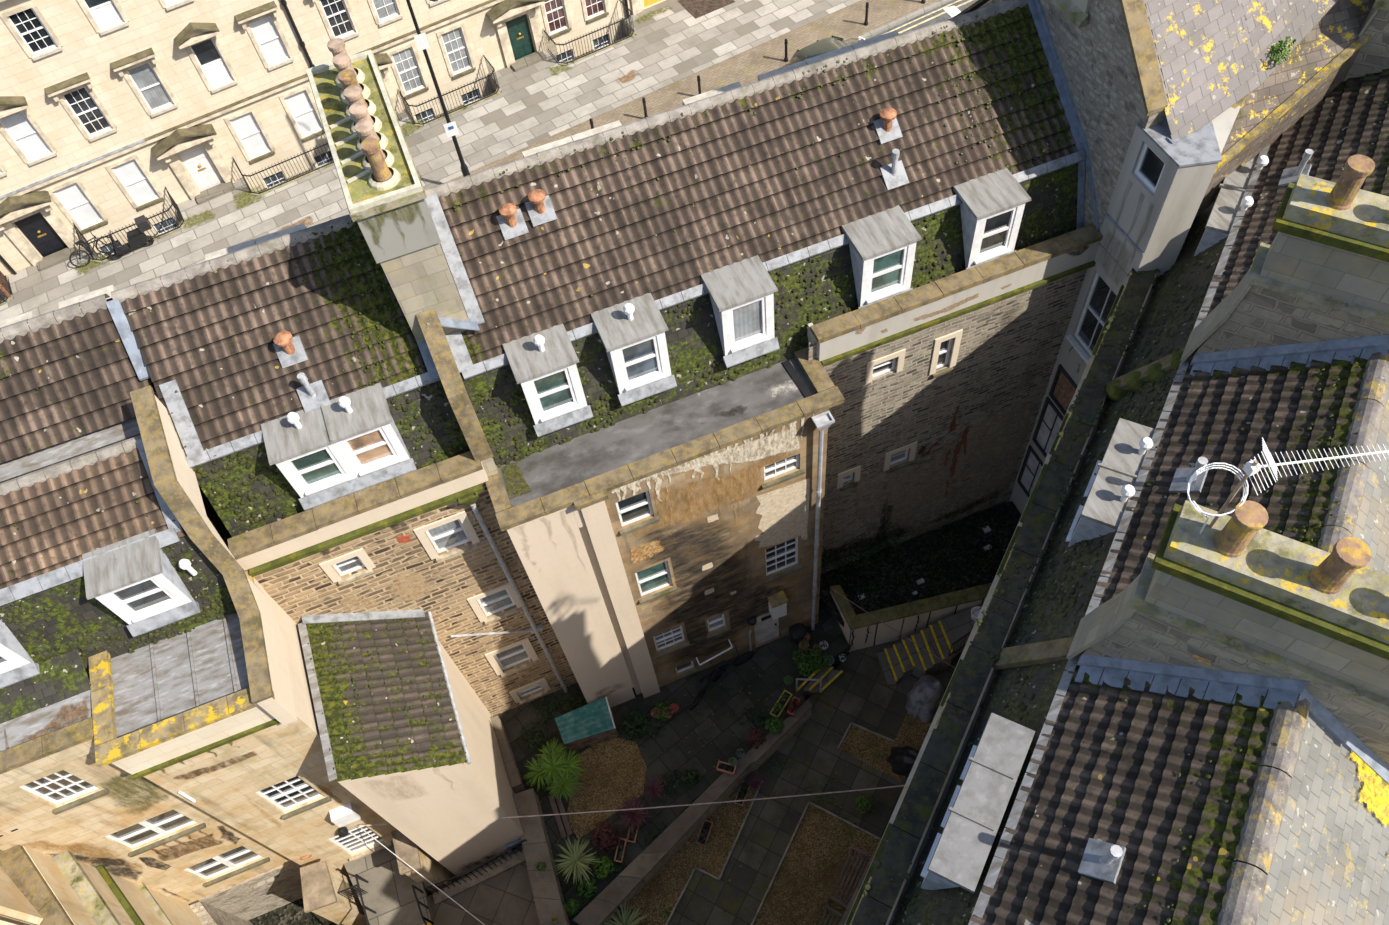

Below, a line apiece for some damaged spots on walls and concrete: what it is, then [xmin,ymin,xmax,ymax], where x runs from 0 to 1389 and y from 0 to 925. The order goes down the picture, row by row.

peeling [612,414,814,502]
damp [29,826,240,870]